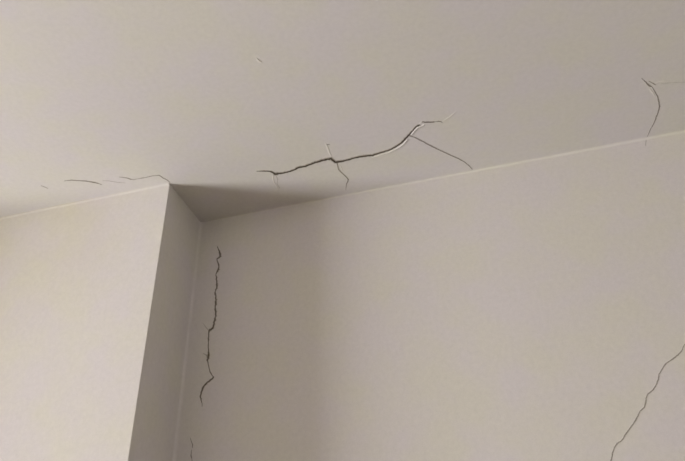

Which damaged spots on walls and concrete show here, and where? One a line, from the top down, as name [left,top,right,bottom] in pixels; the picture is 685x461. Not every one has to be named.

crack [65,175,170,185]
crack [257,111,472,191]
crack [641,78,678,146]
crack [199,246,222,403]
crack [610,344,685,461]